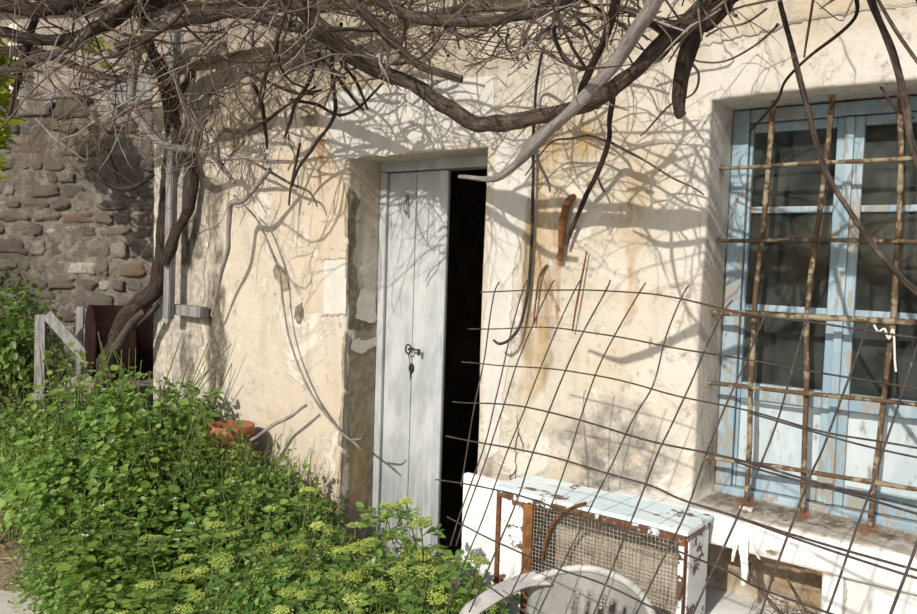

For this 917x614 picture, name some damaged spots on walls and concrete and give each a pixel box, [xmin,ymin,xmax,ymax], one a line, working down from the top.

water stain [182,217,202,270]
water stain [206,179,227,421]
peeling [273,264,288,292]
peeling [294,303,304,324]
water stain [180,336,194,396]
peeling [337,185,377,569]
water stain [559,406,659,486]